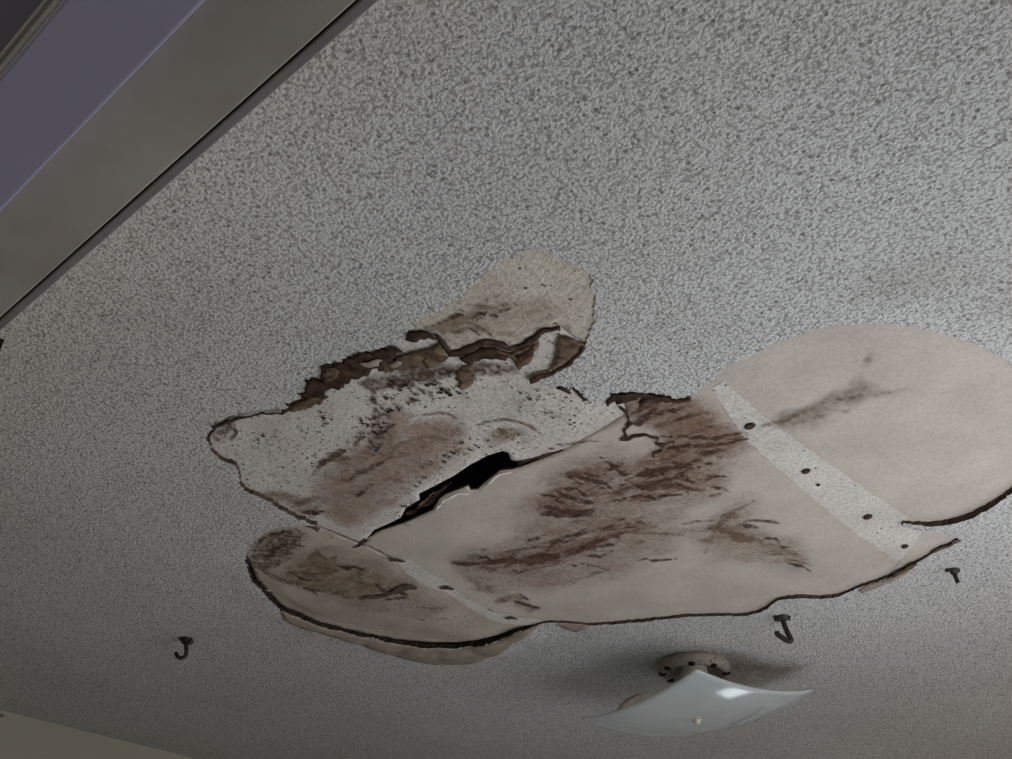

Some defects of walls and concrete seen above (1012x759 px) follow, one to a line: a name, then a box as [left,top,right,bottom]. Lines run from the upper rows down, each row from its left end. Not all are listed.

water stain [431,297,511,341]
water stain [267,363,564,525]
peeling [206,247,1012,632]
water stain [764,386,867,428]
water stain [252,529,412,607]
crack [353,449,564,548]
water stain [452,396,747,612]
water stain [682,501,812,572]